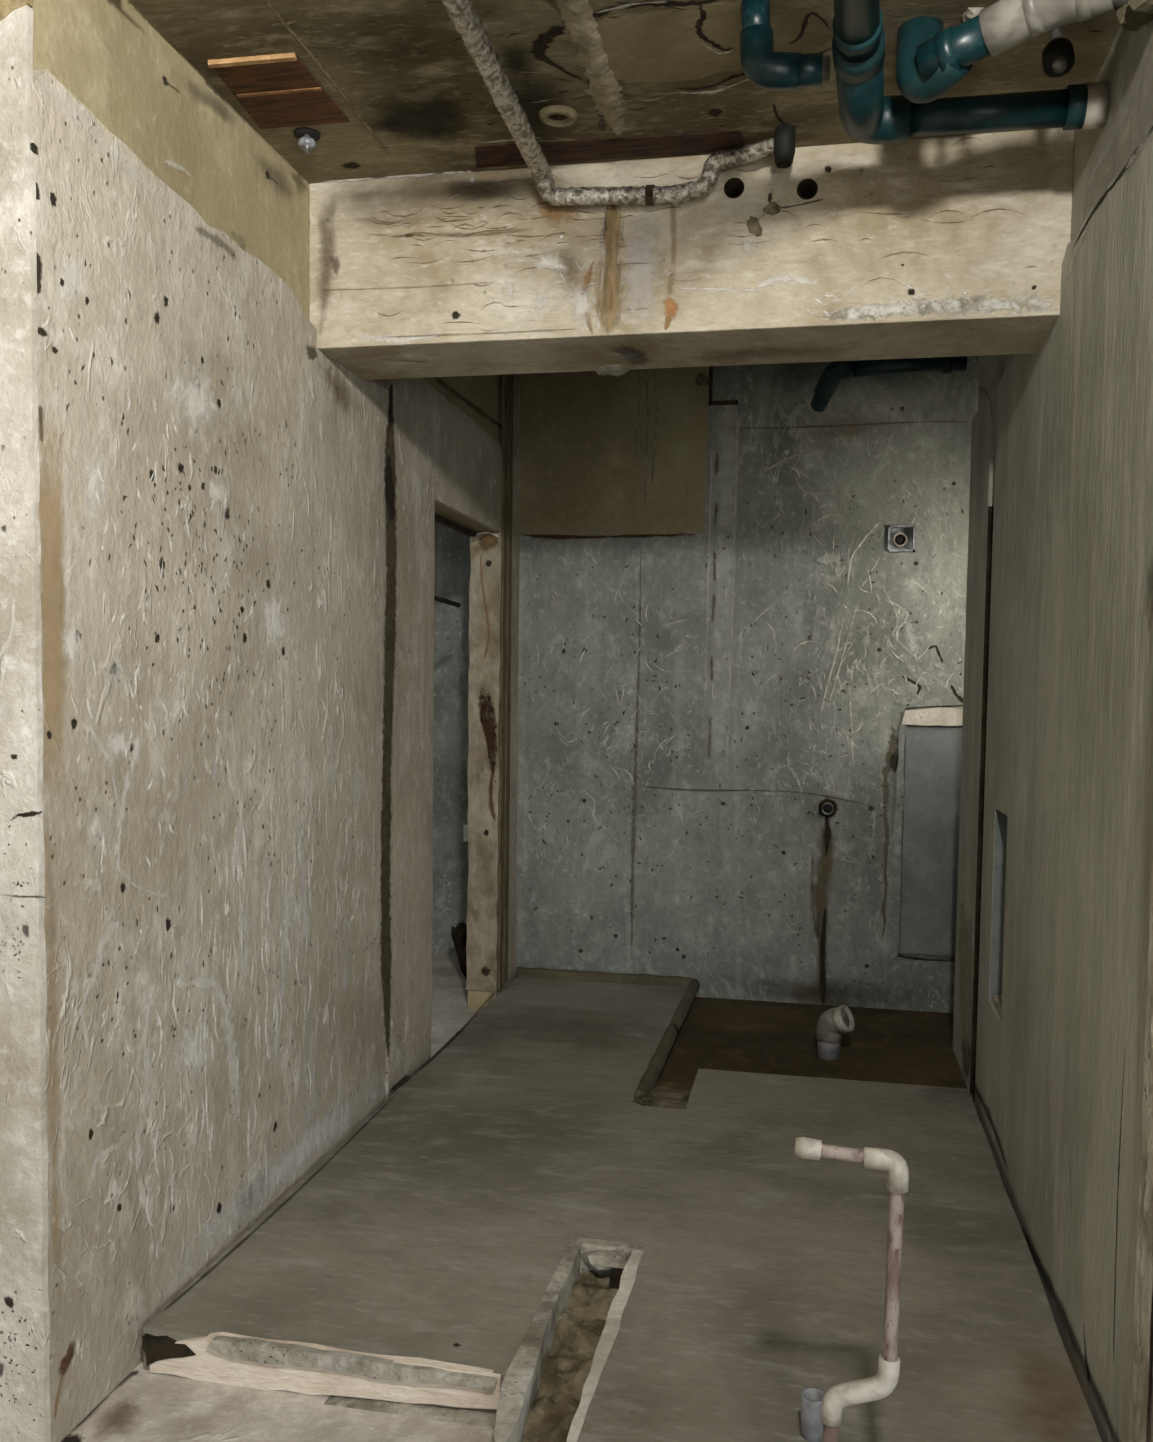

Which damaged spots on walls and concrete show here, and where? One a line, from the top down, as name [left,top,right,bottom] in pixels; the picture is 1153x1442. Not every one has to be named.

crack [531,0,749,131]
crack [773,104,786,125]
crack [791,12,832,53]
corrosion [478,689,498,820]
corrosion [815,798,838,1005]
spalling [142,1333,196,1366]